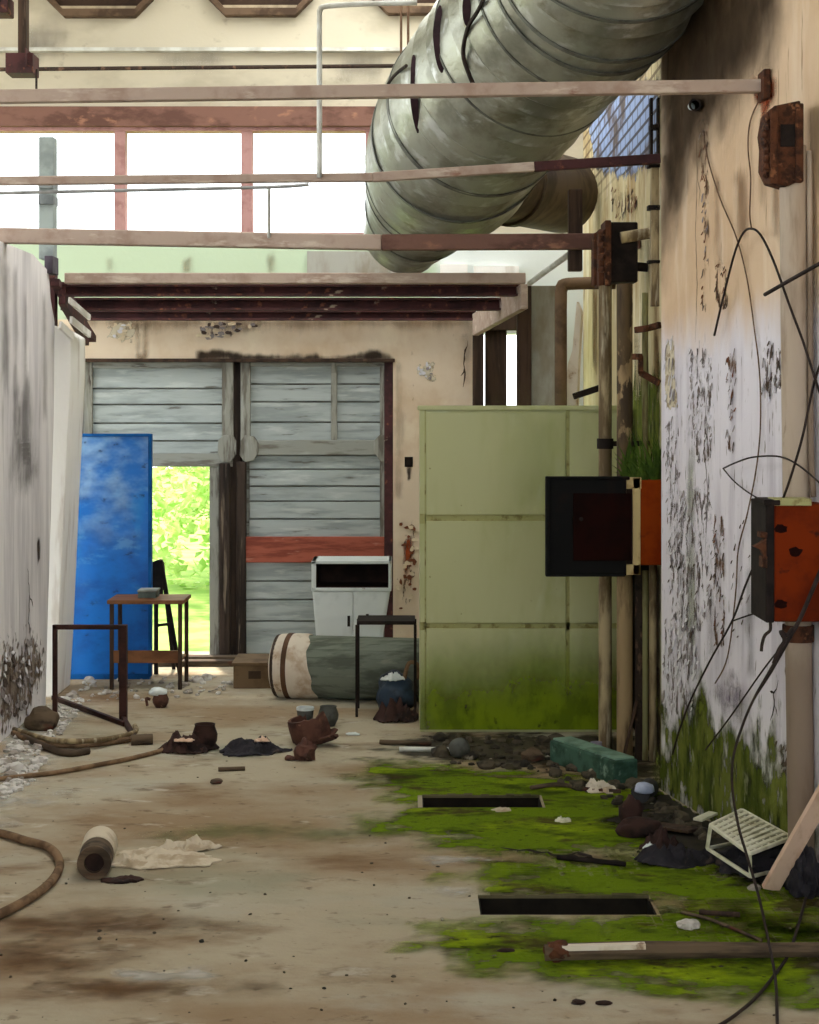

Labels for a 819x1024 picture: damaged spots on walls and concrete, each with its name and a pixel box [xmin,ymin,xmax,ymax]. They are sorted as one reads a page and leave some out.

peeling [196,321,258,340]
peeling [761,341,781,404]
spalling [395,523,419,609]
peeling [662,338,750,721]
spalling [0,628,44,734]
damp [376,732,560,773]
damp [633,736,735,852]
damp [741,876,766,885]